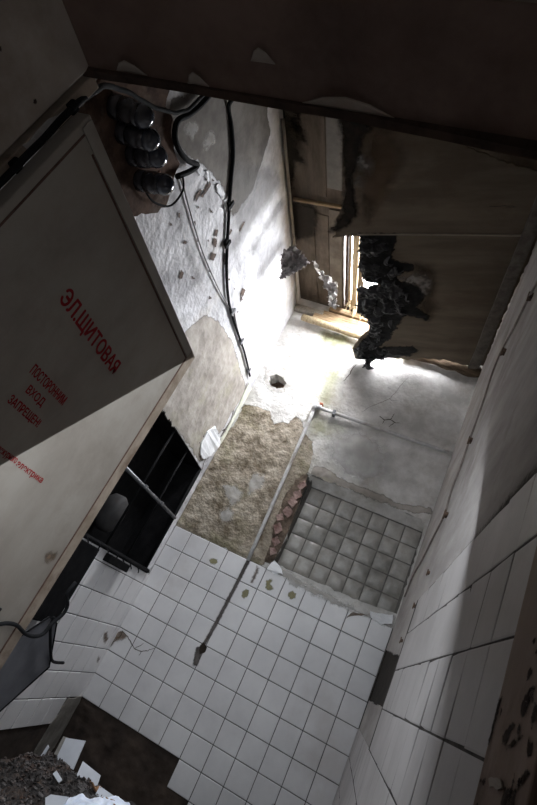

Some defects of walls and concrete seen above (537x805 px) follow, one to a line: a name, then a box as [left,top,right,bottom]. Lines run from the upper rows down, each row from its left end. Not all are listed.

flaking render [163,315,432,575]
peeling [0,697,188,805]
peeling [488,668,537,756]